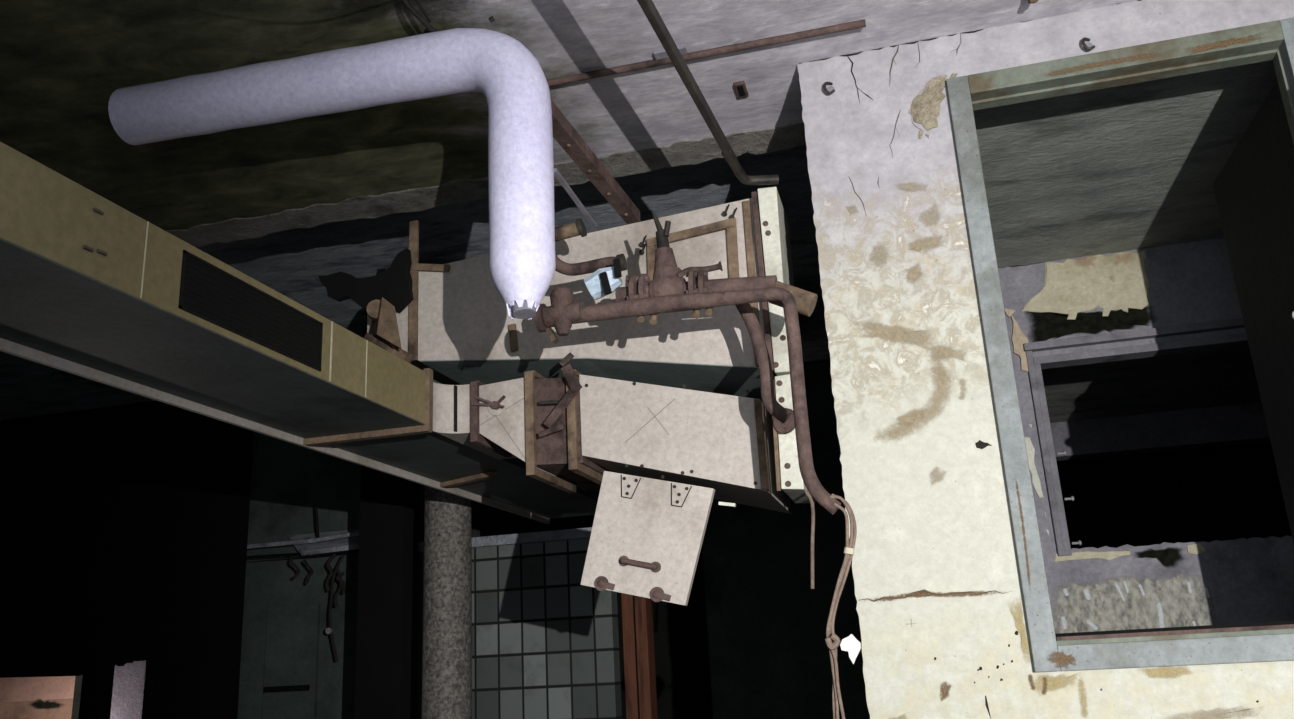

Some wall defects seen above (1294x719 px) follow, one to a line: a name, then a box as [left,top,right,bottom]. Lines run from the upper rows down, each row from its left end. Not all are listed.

crack [799,29,983,213]
spalling [908,73,957,139]
rust [1049,54,1160,75]
peeling [1004,250,1153,372]
water stain [864,323,965,438]
crack [861,589,1011,624]